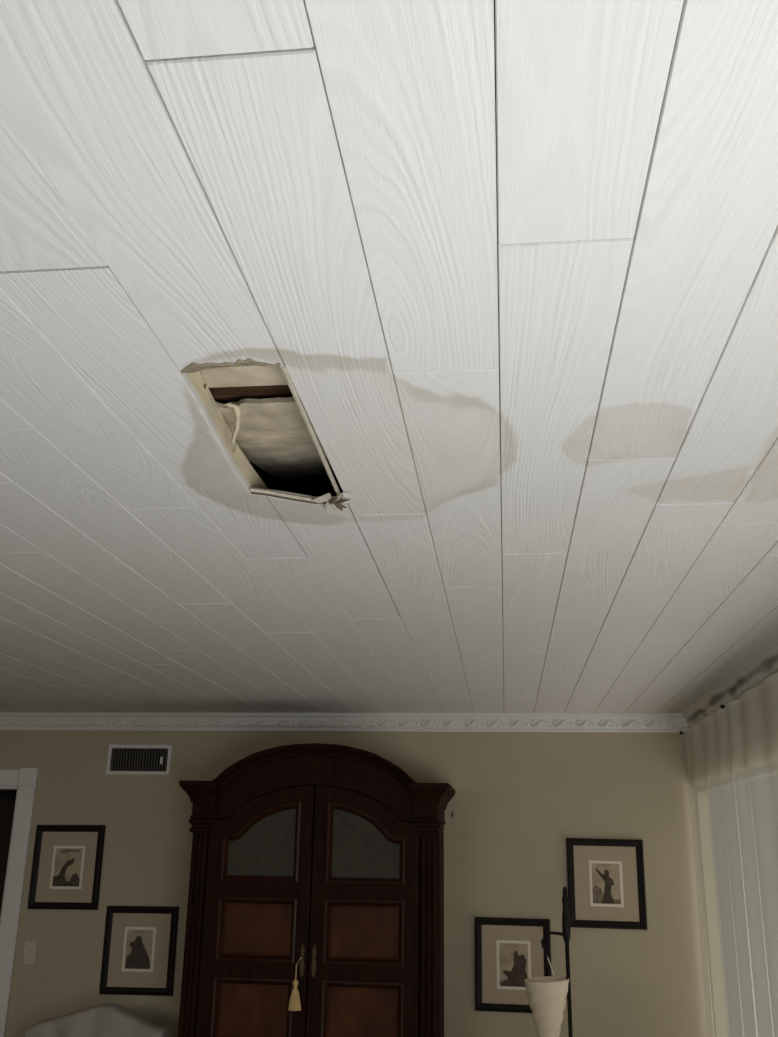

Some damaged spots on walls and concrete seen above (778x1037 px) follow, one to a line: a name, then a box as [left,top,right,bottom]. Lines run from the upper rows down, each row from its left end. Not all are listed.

spalling [248,460,353,498]